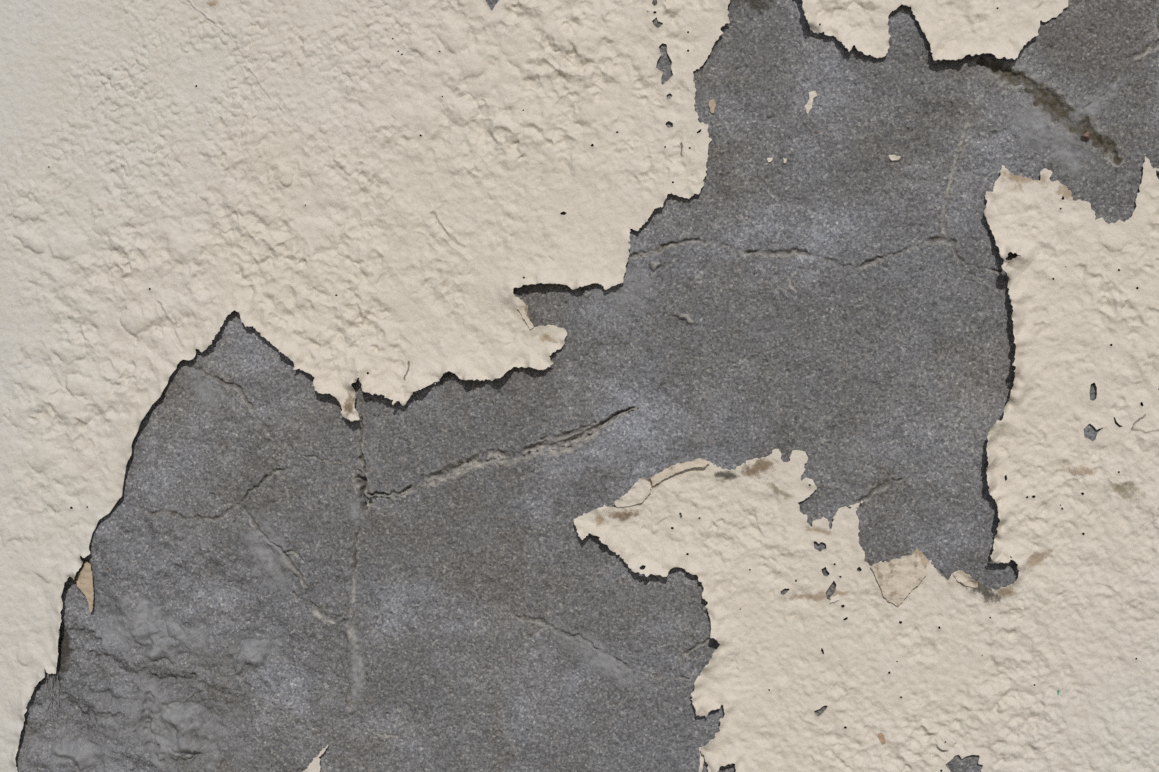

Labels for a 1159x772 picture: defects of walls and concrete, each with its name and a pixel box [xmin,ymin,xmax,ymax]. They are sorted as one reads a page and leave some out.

crack [185,0,286,116]
peeling [657,47,673,99]
peeling [972,0,1158,168]
crack [1082,0,1159,112]
crack [628,115,1004,294]
peeling [509,290,567,369]
peeling [309,370,369,422]
crack [129,360,643,720]
peeling [574,505,612,543]
peeling [833,500,865,557]
peeling [12,667,207,772]
spalling [51,644,246,735]